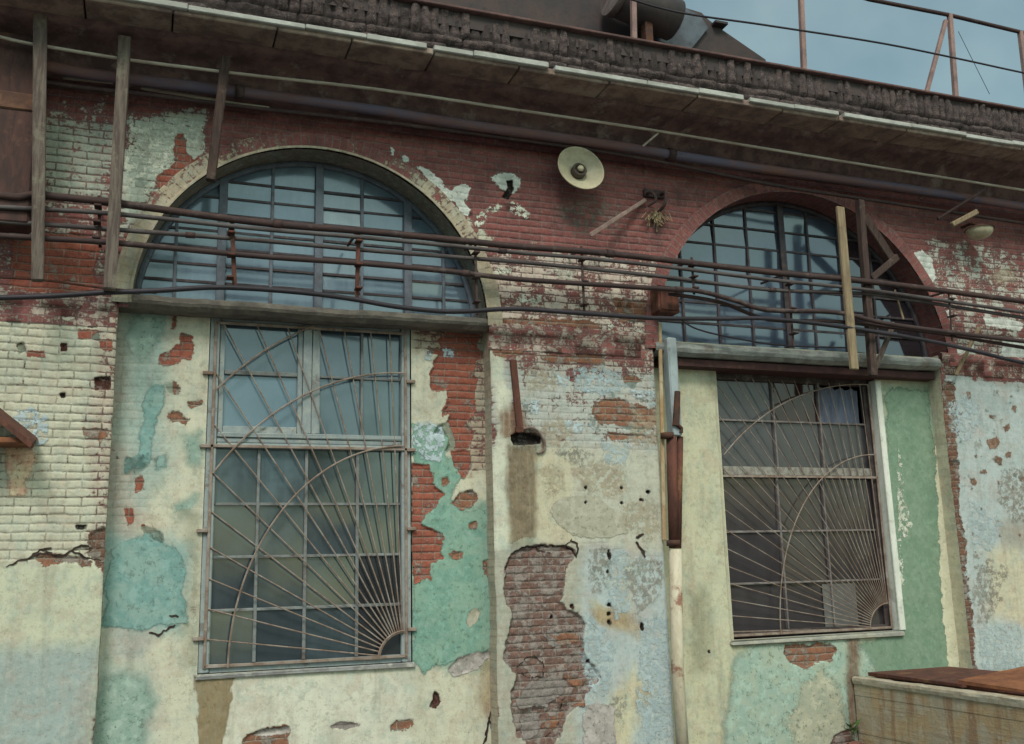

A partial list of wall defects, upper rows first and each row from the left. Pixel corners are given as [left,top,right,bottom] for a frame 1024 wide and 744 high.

flaking render [143,133,200,199]
flaking render [158,316,194,366]
peeling [982,315,1024,358]
flaking render [411,332,523,584]
hole [511,432,541,445]
flaking render [523,354,657,494]
crack [6,544,101,567]
leakage [507,445,536,543]
flaking render [942,380,1024,670]
flaking render [503,544,674,744]
flaking render [784,641,837,669]
spalling [241,724,291,744]